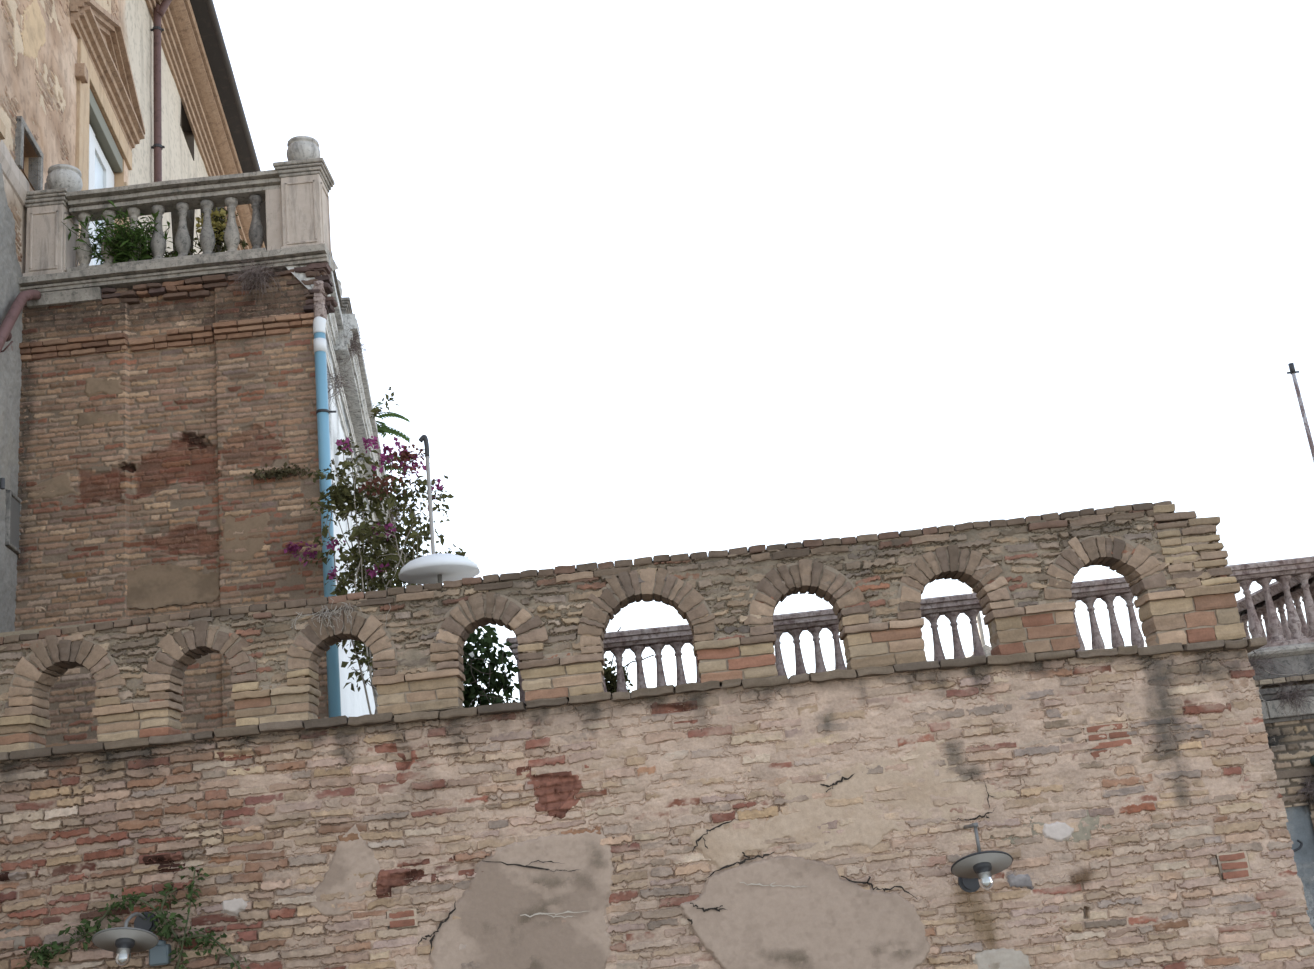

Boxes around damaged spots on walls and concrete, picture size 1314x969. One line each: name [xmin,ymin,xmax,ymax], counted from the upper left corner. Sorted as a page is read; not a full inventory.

flaking render [94,0,119,21]
flaking render [0,0,70,161]
crack [484,860,578,872]
crack [690,818,807,912]
crack [520,910,587,918]